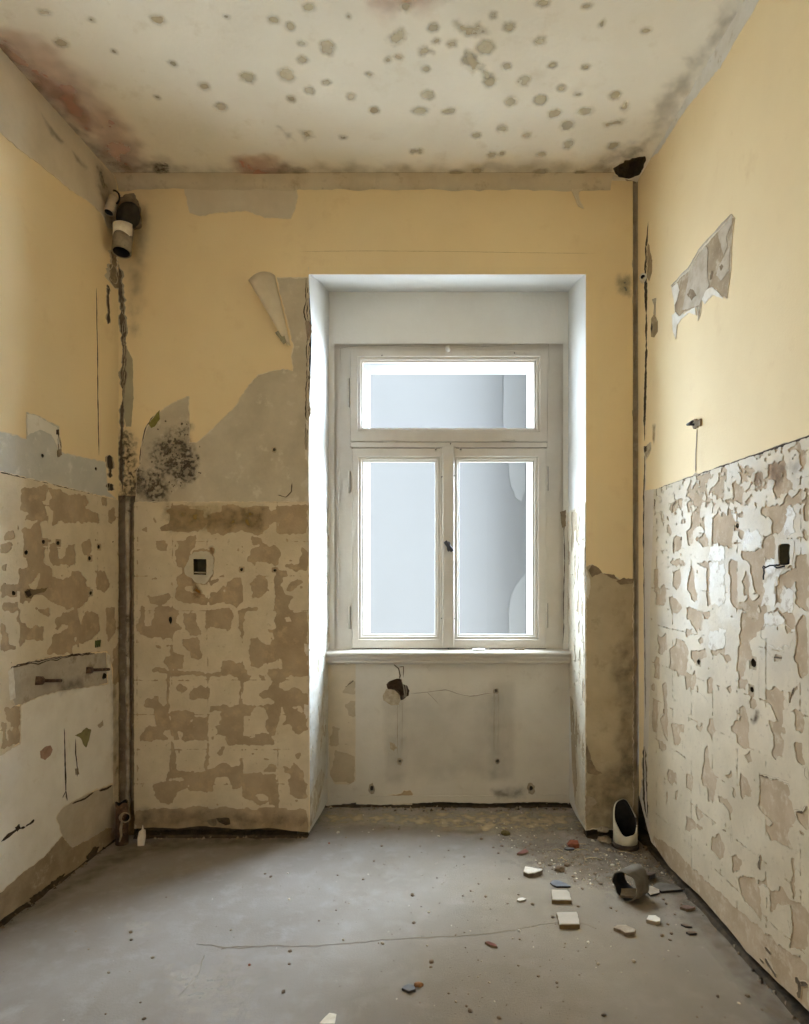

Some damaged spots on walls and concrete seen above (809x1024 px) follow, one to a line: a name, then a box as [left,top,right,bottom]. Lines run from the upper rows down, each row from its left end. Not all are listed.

leakage [536,96,590,129]
flaking render [613,0,759,183]
peeling [184,189,298,219]
peeling [671,214,735,339]
peeling [0,412,117,500]
mould [118,420,201,501]
spalling [24,588,47,599]
peeling [133,271,809,1024]
flaking render [0,684,116,929]
crack [178,922,558,997]